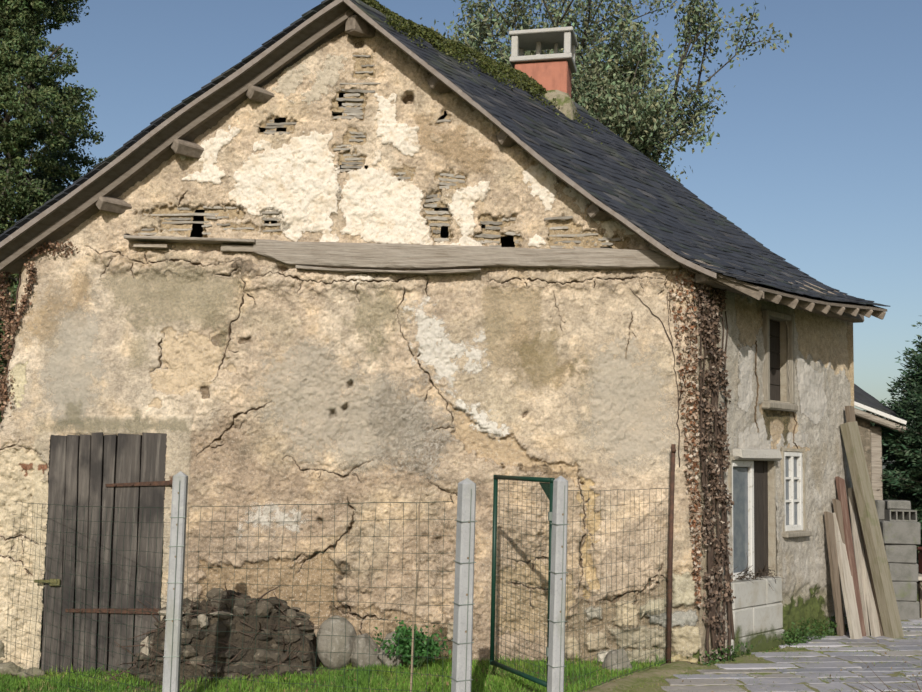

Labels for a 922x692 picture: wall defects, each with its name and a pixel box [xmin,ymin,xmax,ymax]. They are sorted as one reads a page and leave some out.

peeling [181,93,490,246]
peeling [528,234,546,248]
peeling [519,163,591,213]
rust [19,463,48,476]
crack [196,400,272,457]
crack [85,245,455,431]
damp [238,503,308,539]
crack [282,454,372,573]
damp [264,296,509,480]
crack [506,555,549,608]
crack [575,479,668,605]
peeling [737,308,850,454]